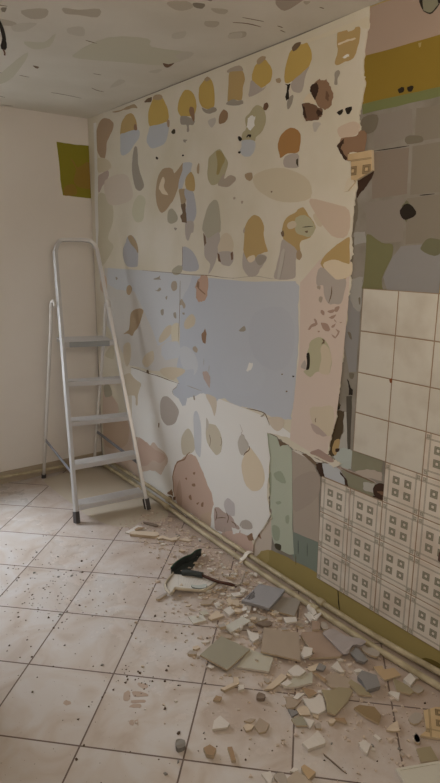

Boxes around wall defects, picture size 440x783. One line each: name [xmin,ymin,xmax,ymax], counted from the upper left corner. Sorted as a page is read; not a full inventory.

spalling [419,0,440,12]
peeling [96,9,361,191]
spalling [337,130,367,162]
peeling [123,235,138,267]
peeling [154,149,268,329]
peeling [274,207,316,280]
spalling [356,171,374,198]
spalling [400,200,416,222]
peeling [124,308,143,336]
peeling [301,237,352,377]
spalling [167,371,265,554]
peeling [293,394,344,477]